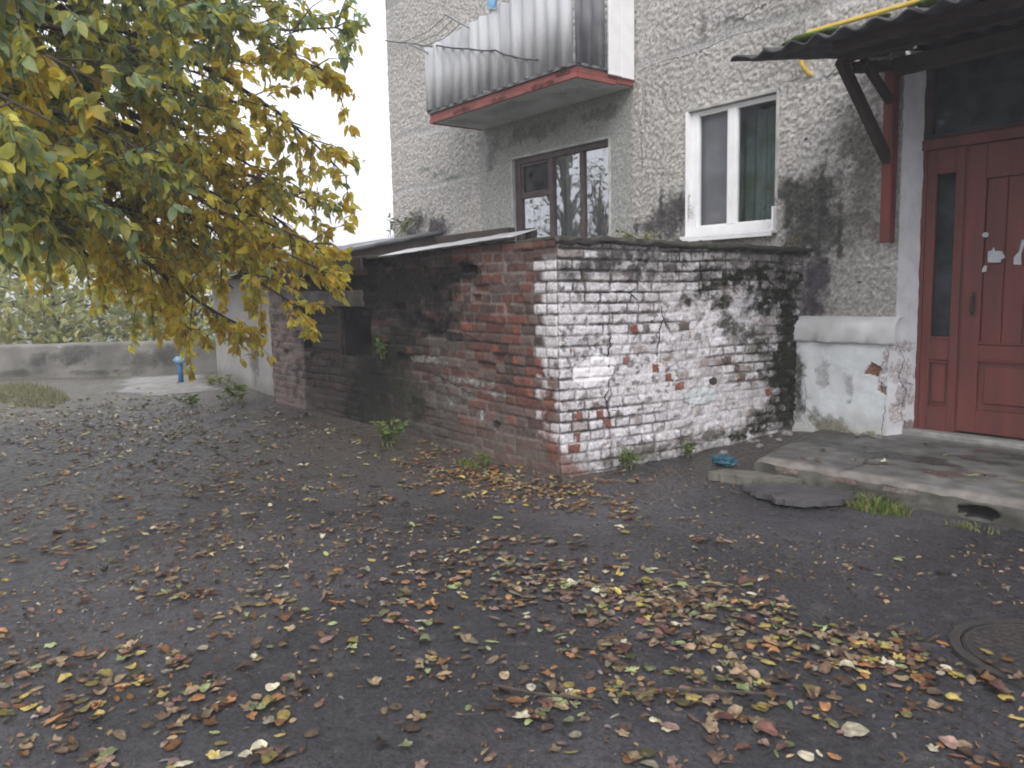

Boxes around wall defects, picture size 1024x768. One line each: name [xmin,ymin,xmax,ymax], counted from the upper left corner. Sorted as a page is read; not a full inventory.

damp [628,121,1024,466]
peeling [526,388,555,416]
peeling [545,411,583,458]
crack [604,332,619,422]
peeling [652,364,685,390]
crack [838,349,908,474]
peeling [864,340,915,430]
spalling [957,504,1000,521]